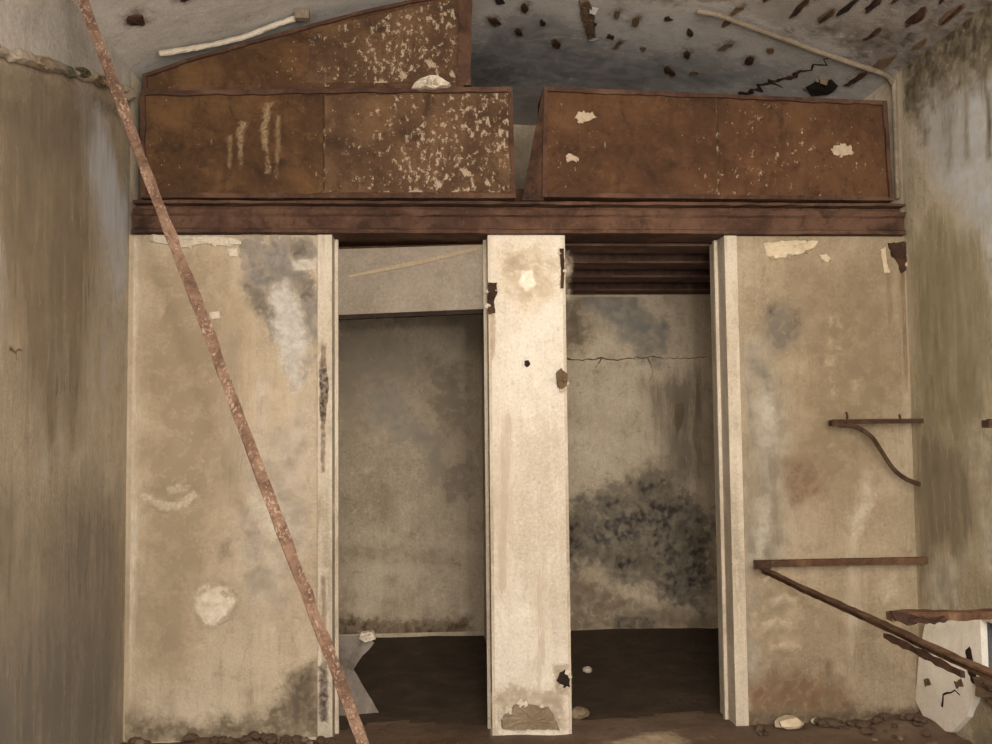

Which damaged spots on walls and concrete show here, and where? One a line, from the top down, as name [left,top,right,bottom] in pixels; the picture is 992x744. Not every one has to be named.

peeling [579,0,624,49]
spalling [818,0,898,23]
crack [738,58,829,95]
spalling [802,53,897,97]
damp [902,2,992,323]
spalling [763,238,831,263]
damp [0,73,318,652]
crack [567,356,706,380]
damp [917,428,992,610]
damp [570,580,711,631]
damp [124,662,318,742]
spalling [494,665,572,732]